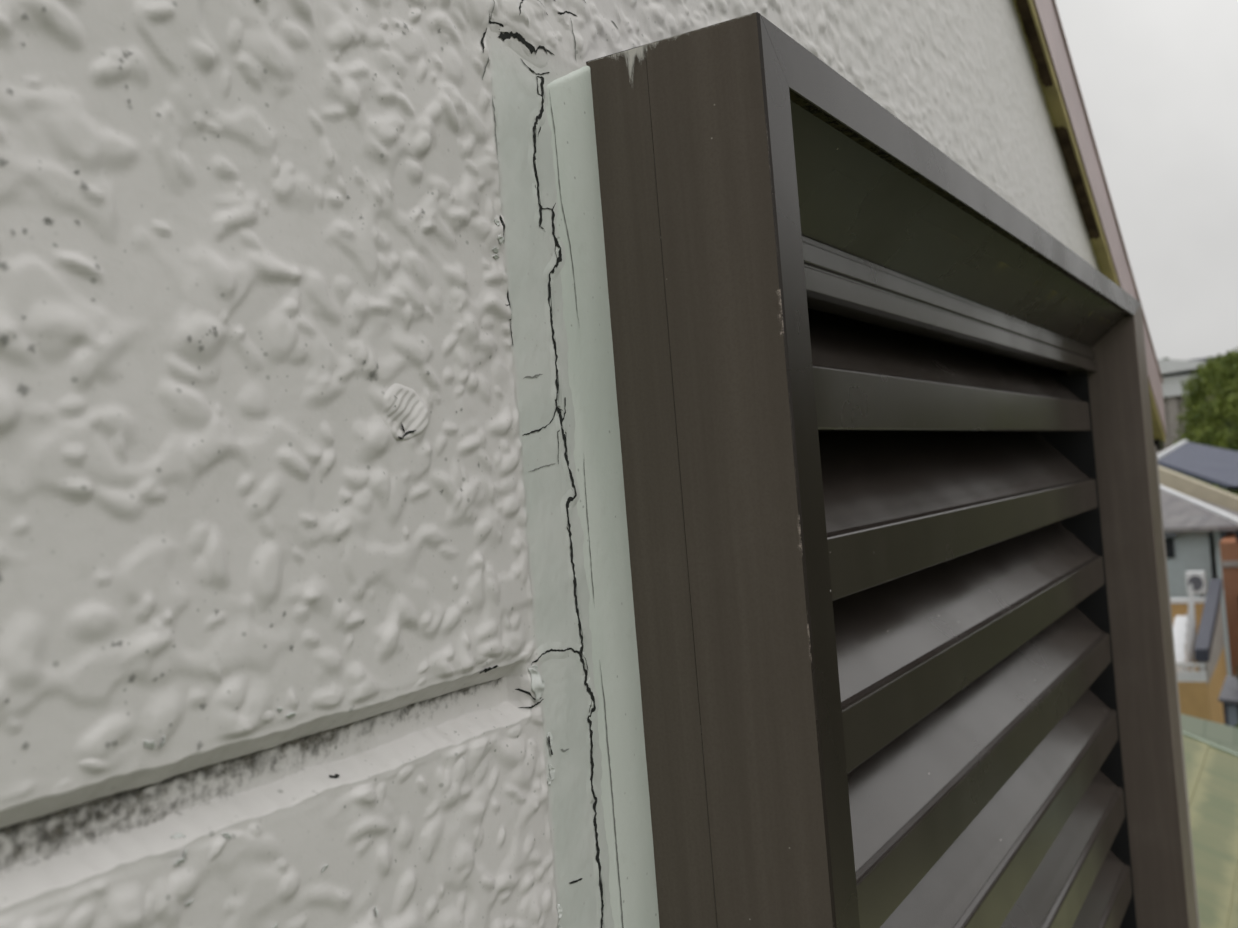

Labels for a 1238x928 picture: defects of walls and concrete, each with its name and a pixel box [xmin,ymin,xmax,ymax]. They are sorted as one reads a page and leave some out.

water stain [0,677,502,858]
crack [474,0,624,928]